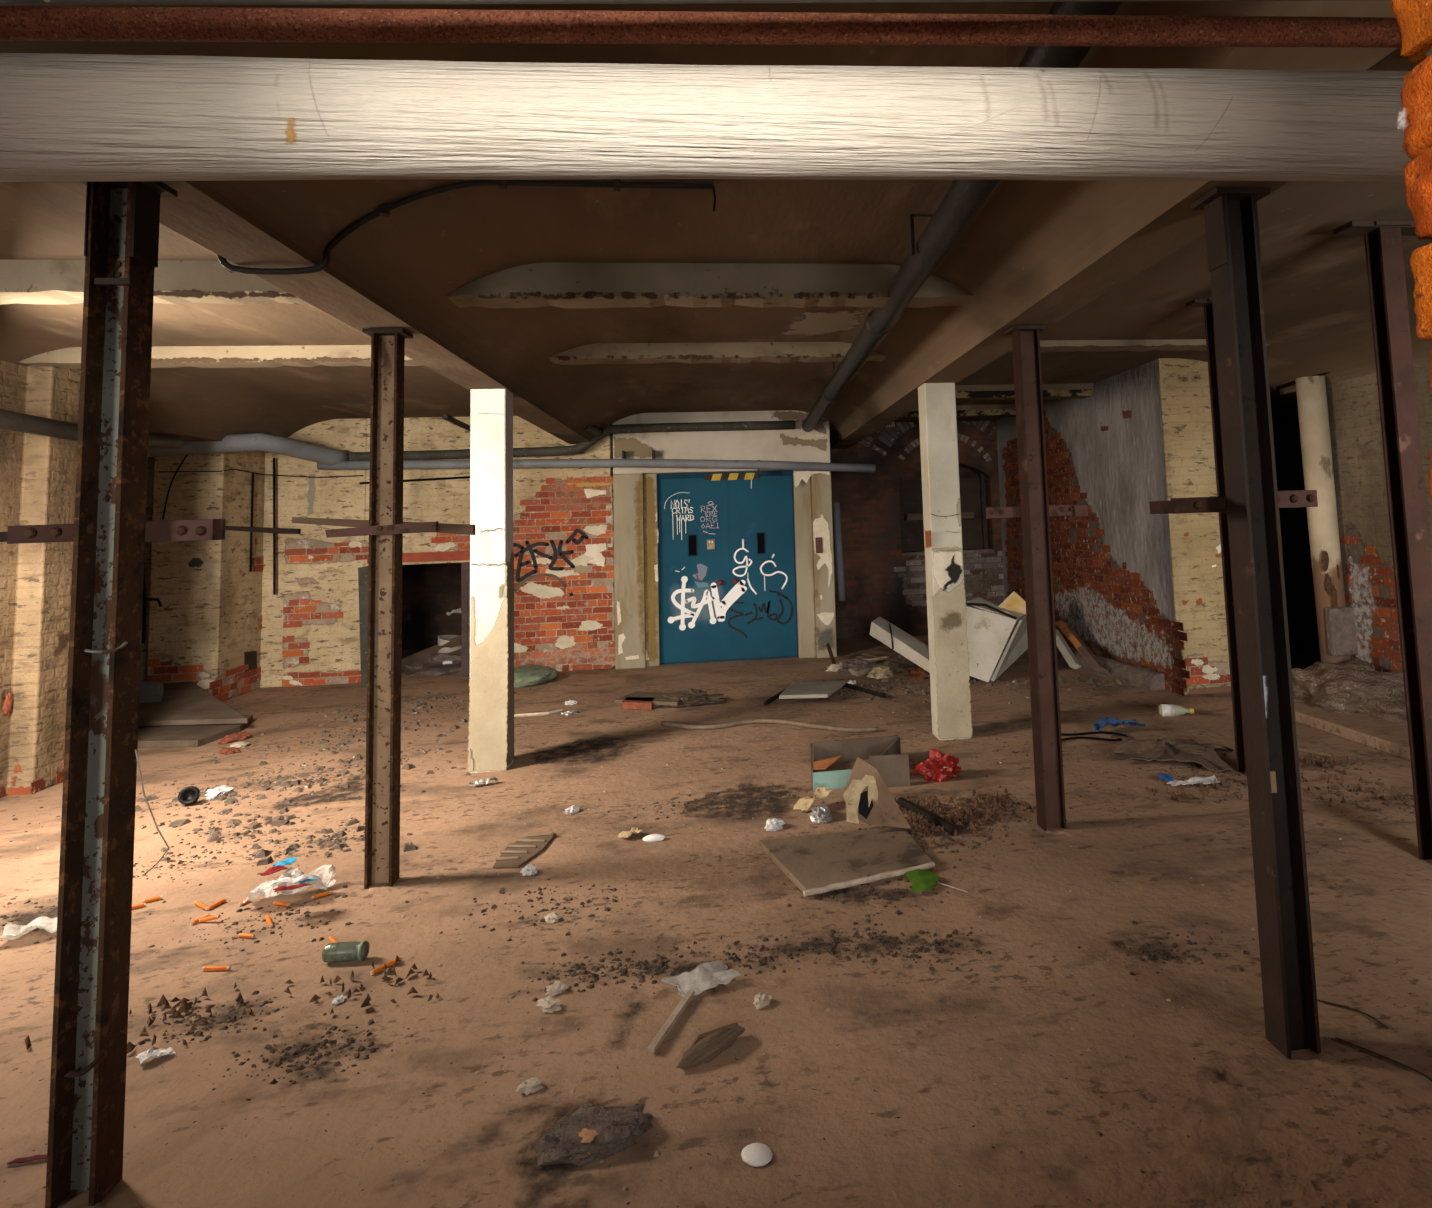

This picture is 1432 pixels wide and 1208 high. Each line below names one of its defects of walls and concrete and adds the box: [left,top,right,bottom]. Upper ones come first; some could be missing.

peeling [955,390,1016,416]
rust [53,633,69,656]
flaking render [431,533,470,552]
flaking render [467,476,649,772]
peeling [813,514,834,626]
peeling [894,438,1026,739]
flaking render [1043,389,1231,696]
flaking render [1339,525,1402,672]